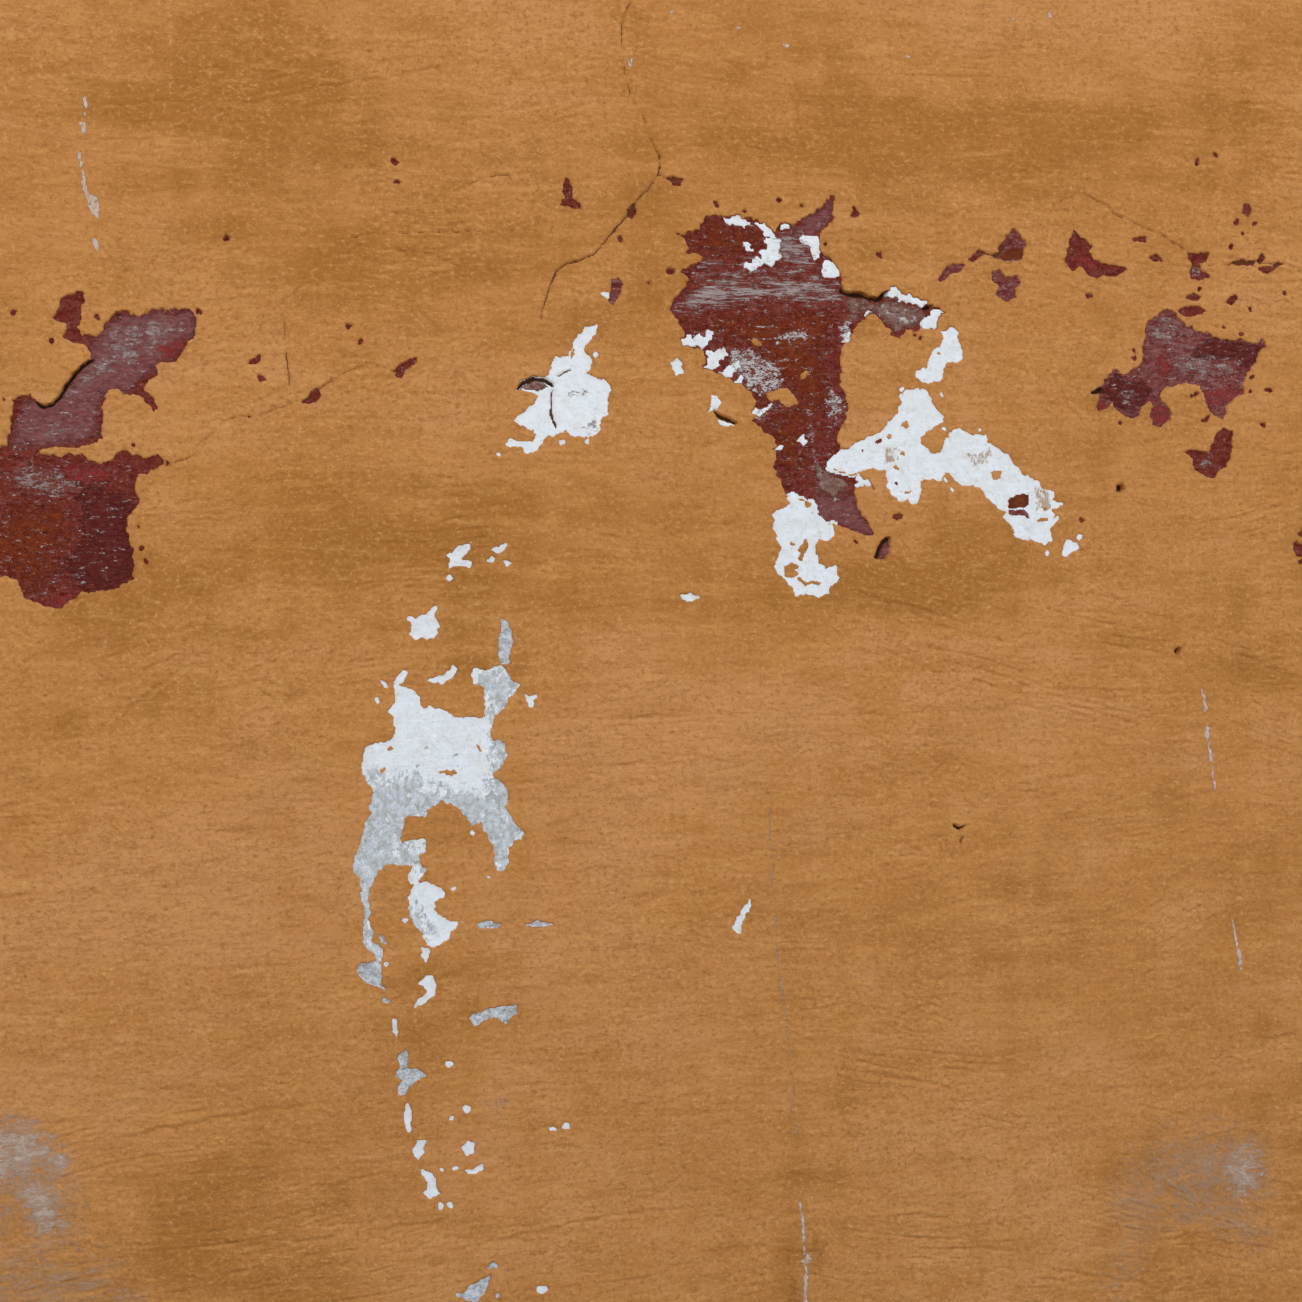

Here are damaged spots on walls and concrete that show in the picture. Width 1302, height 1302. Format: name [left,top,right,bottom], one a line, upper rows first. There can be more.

crack [540,3,683,320]
peeling [1065,230,1127,279]
peeling [1186,252,1209,281]
peeling [0,291,202,609]
peeling [496,324,611,456]
peeling [670,195,1083,598]
peeling [1096,309,1266,478]
peeling [1293,531,1302,564]
peeling [407,606,440,640]
peeling [353,618,537,1210]
peeling [456,1262,499,1302]